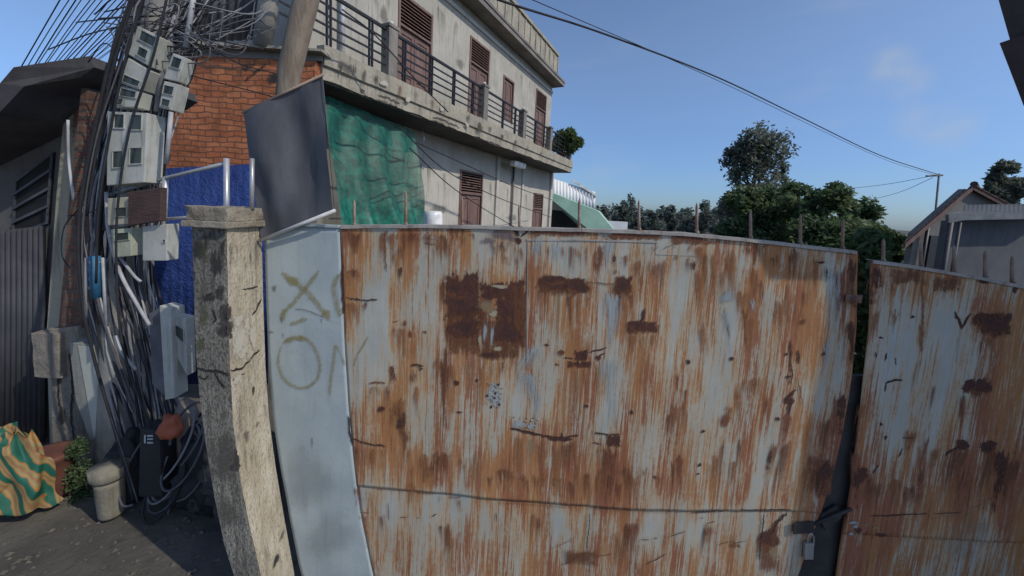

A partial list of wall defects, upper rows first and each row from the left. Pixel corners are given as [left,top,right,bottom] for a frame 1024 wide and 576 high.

rust [341,265,357,314]
rust [955,311,1013,358]
crack [194,350,260,389]
rust [369,228,961,503]
rust [959,378,993,426]
rust [851,430,1020,510]
rust [440,525,457,560]
rust [615,522,640,559]
rust [757,513,787,573]